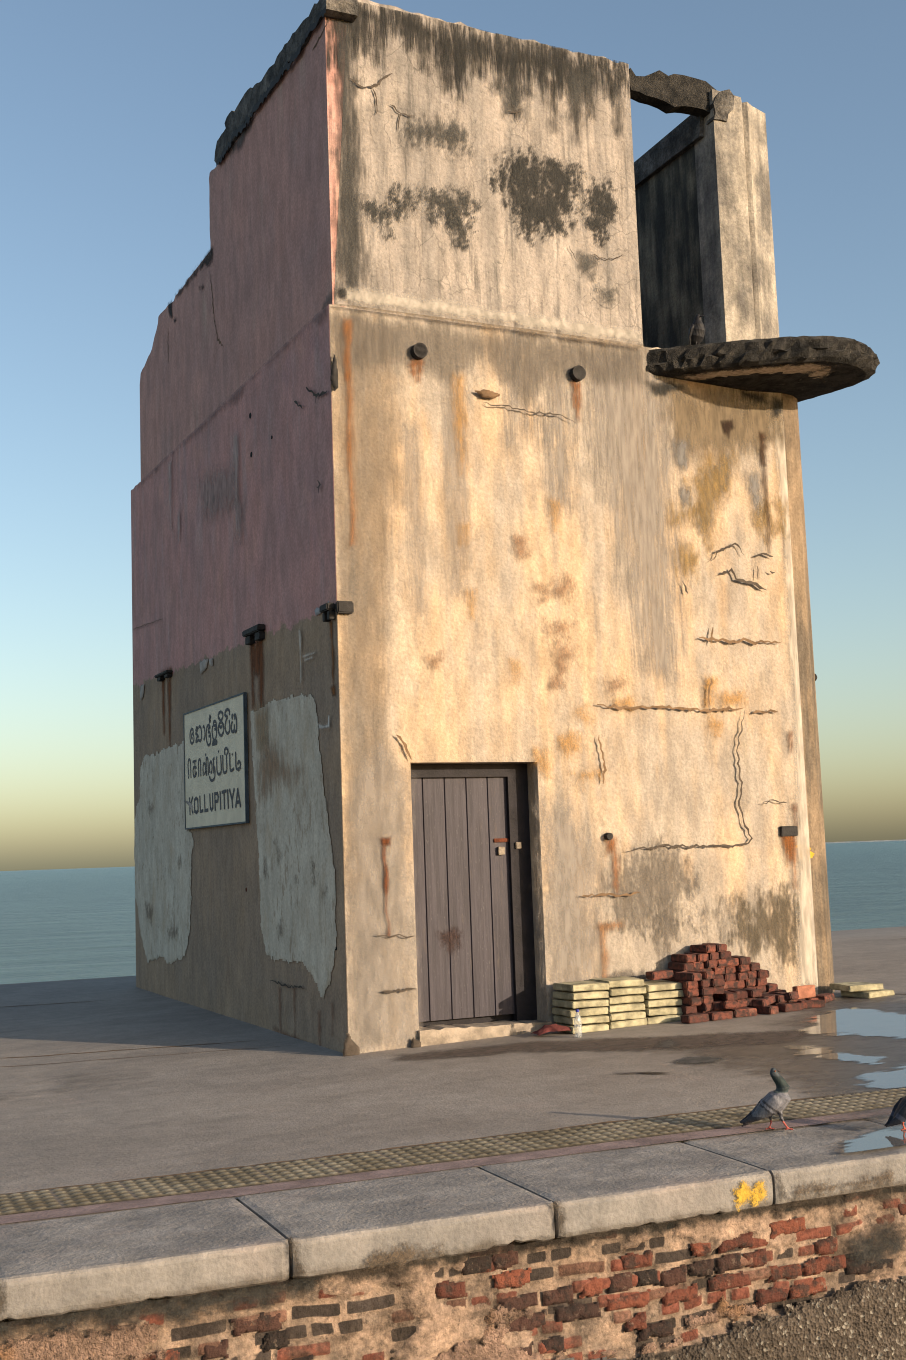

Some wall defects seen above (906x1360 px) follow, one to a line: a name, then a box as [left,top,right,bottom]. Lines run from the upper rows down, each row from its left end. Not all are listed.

water stain [313,2,784,678]
crack [711,543,775,590]
corrosion [162,669,171,739]
corrosion [250,640,264,708]
crack [597,678,786,852]
crack [699,628,781,645]
peeling [134,741,194,964]
peeling [250,693,337,998]
corrosion [381,837,391,937]
water stain [354,751,906,1128]
flaking render [203,1312,313,1360]
flaking render [435,1217,893,1356]